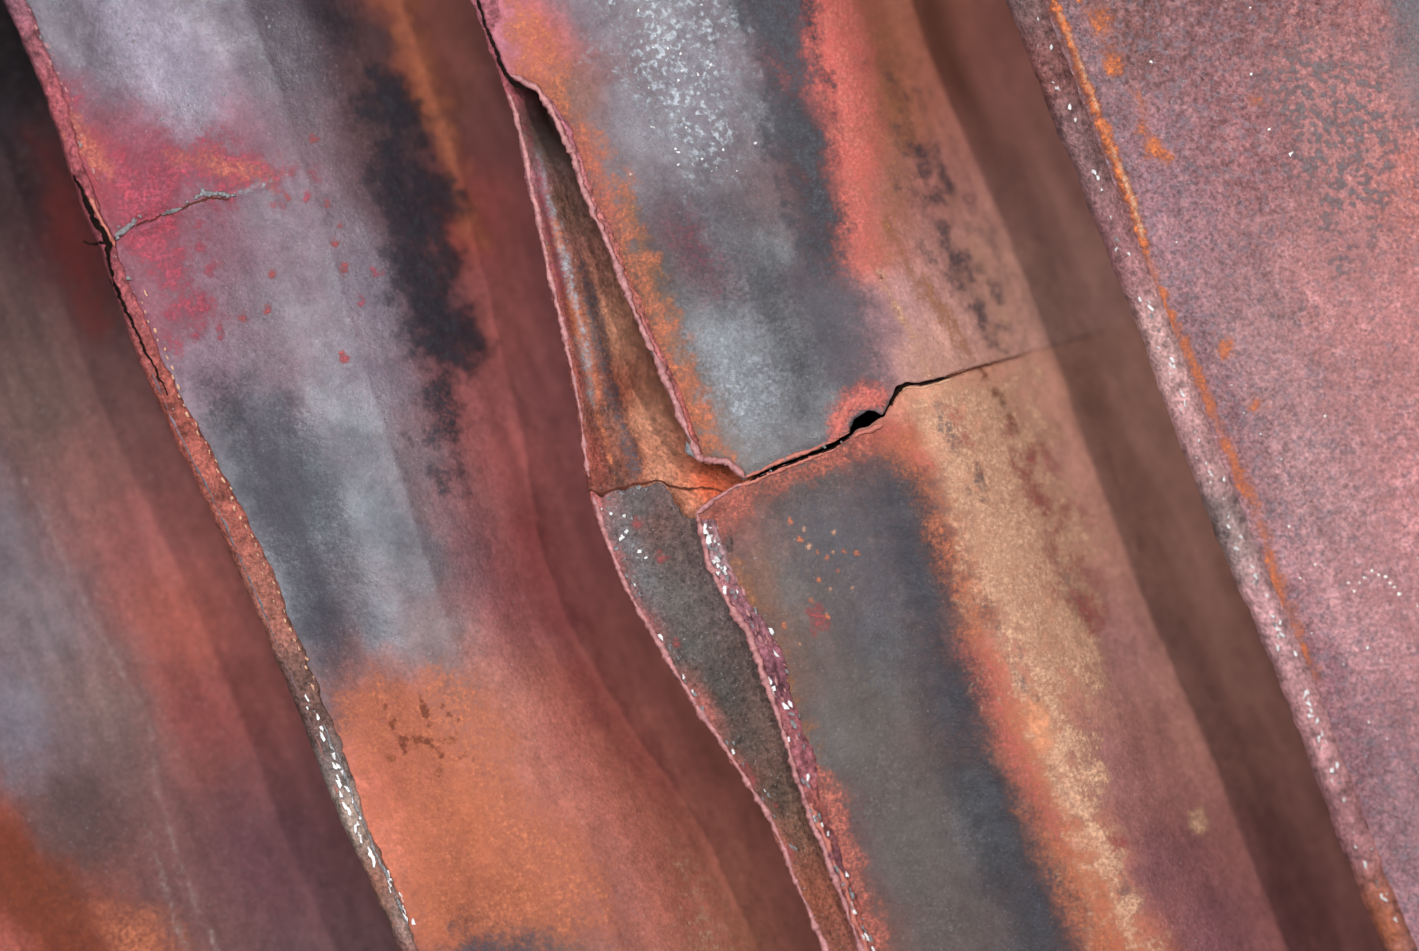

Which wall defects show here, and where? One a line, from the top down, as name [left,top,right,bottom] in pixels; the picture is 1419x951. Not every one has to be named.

crack [73,175,280,396]
rust [47,87,311,354]
rust [374,0,489,248]
rust [503,0,736,479]
rust [592,496,830,951]
crack [587,432,851,514]
rust [801,0,968,352]
rust [699,361,1163,951]
crack [890,356,1020,423]
rust [1048,0,1260,507]
rust [1258,524,1286,606]
rust [1254,0,1412,276]